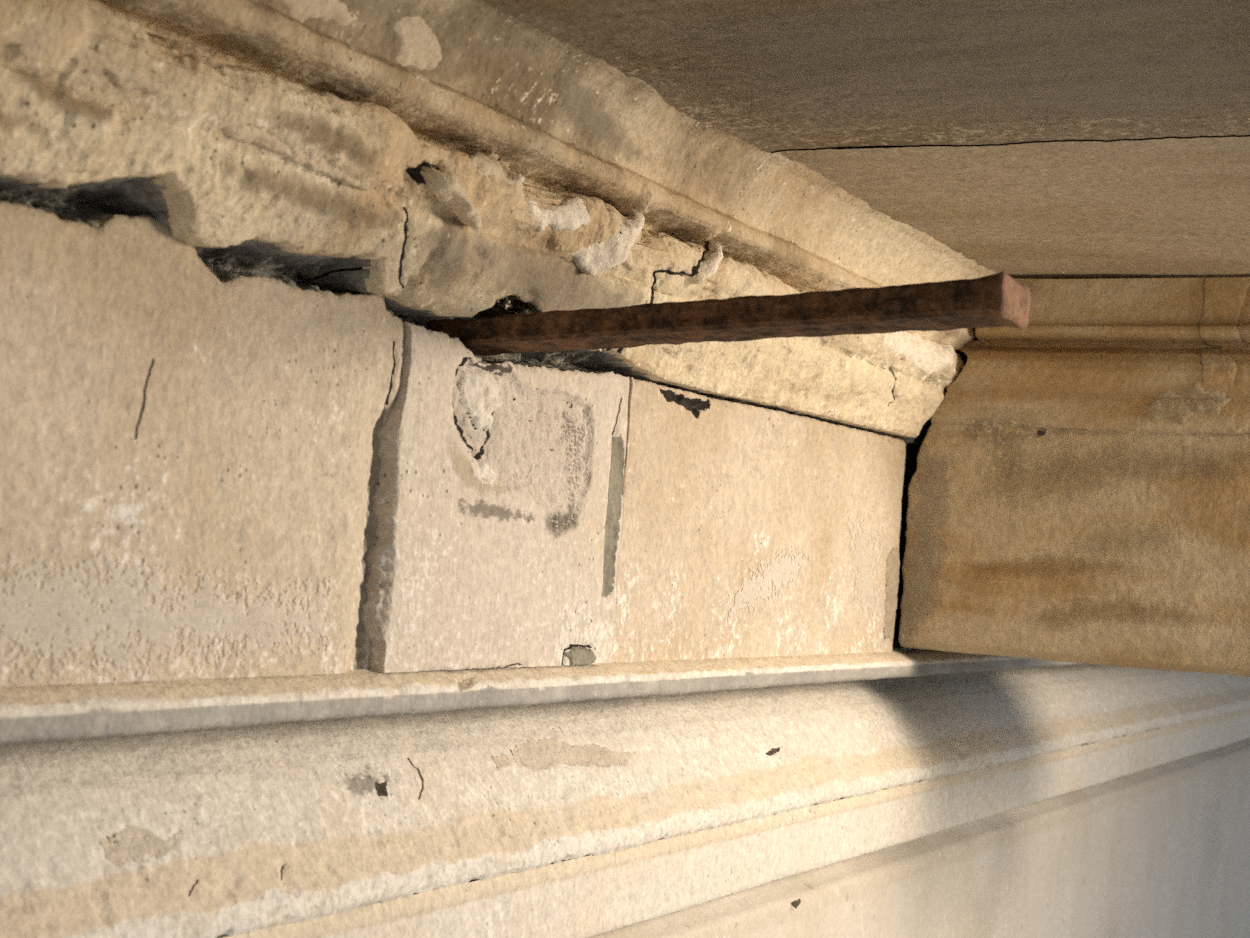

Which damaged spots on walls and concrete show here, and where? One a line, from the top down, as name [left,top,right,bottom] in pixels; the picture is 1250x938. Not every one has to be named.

peeling [282,0,357,27]
peeling [394,16,442,83]
crack [0,174,500,405]
crack [650,240,709,303]
crack [946,328,978,392]
crack [474,348,932,650]